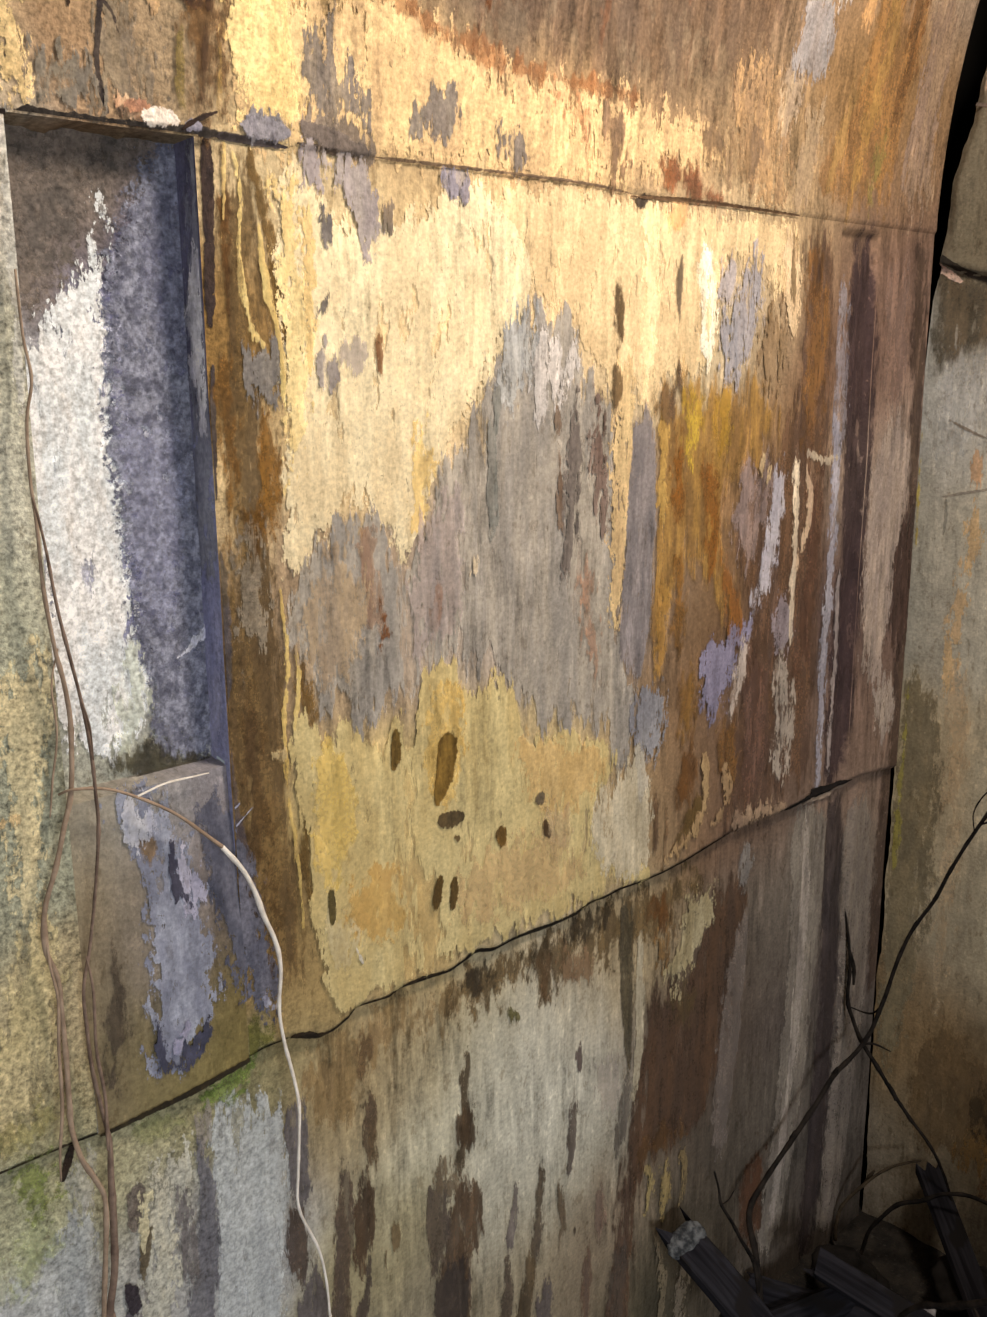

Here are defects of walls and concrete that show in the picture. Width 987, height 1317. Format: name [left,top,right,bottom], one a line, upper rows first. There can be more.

crack [0,0,800,216]
rust [659,106,765,211]
rust [819,0,932,222]
crack [940,255,987,283]
rust [213,147,318,983]
crack [780,779,852,812]
crack [0,833,729,1182]
leakage [575,1041,583,1072]
leakage [711,911,748,1162]
leakage [423,1046,485,1317]
leakage [501,1093,607,1317]
leakage [667,1220,707,1260]